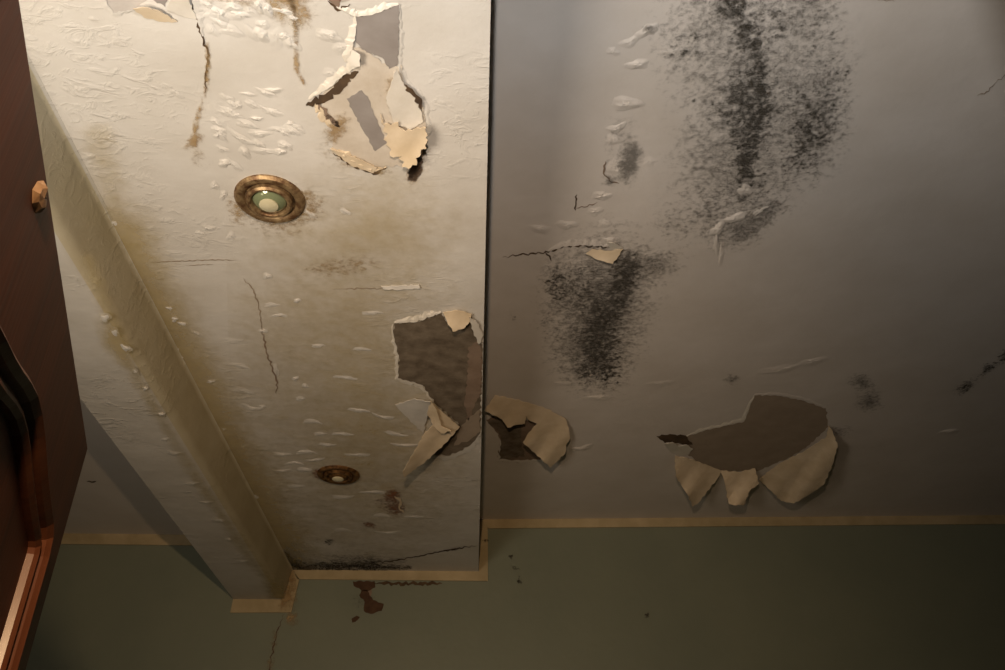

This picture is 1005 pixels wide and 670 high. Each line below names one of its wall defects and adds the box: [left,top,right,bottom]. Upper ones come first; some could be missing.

peeling [306,0,432,182]
damp [693,0,849,203]
peeling [390,310,570,477]
damp [545,250,660,385]
peeling [657,392,838,506]